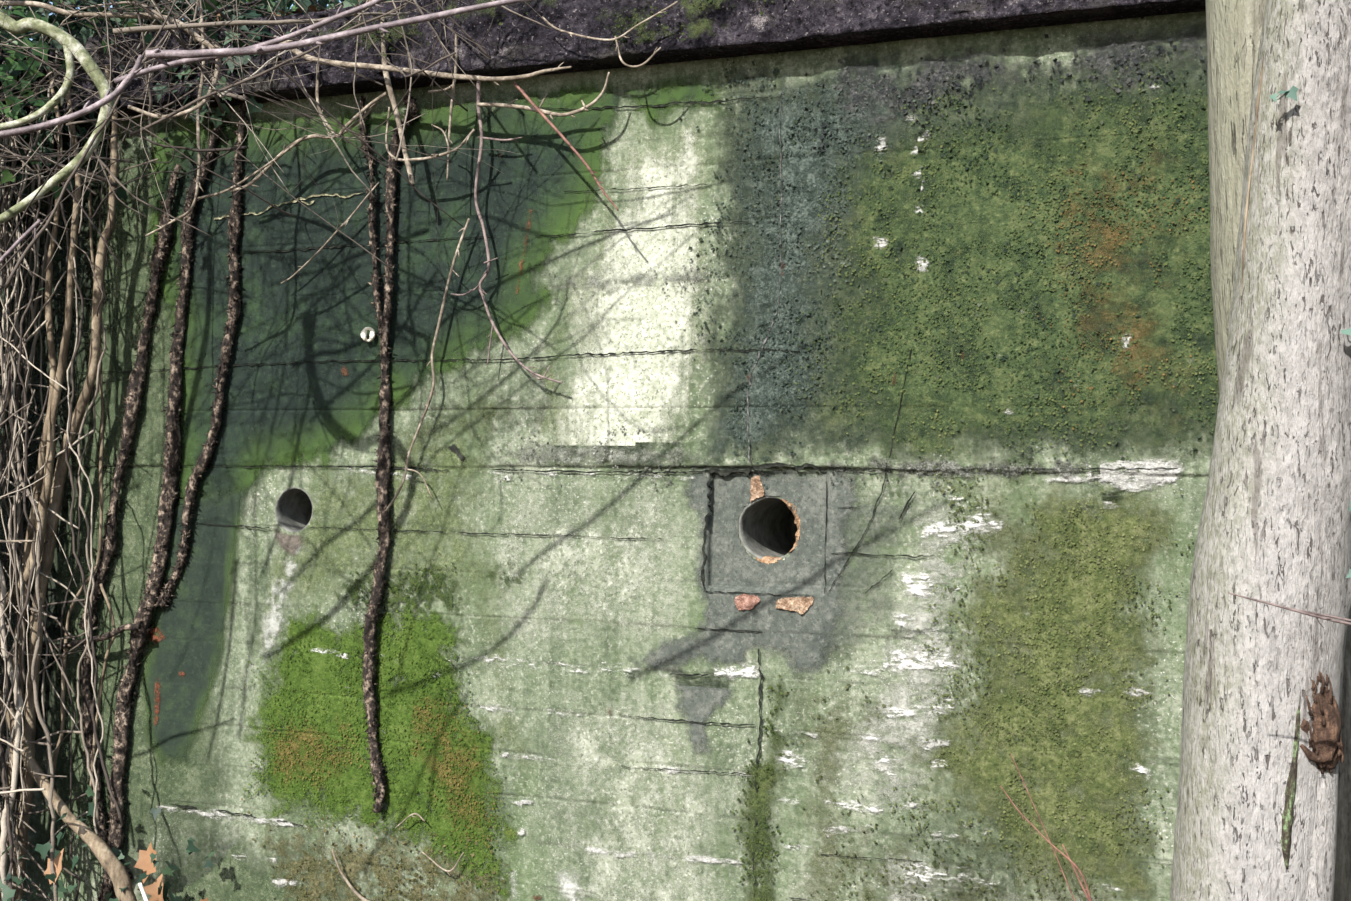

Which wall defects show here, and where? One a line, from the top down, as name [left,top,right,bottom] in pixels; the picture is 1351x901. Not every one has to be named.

crack [65,89,1176,596]
leakage [556,129,708,446]
leakage [144,488,246,762]
leakage [537,505,665,623]
spalling [735,594,760,610]
leakage [560,467,1002,826]
spalling [775,596,814,614]
leakage [1046,458,1183,504]
crack [172,804,303,826]
leakage [547,709,741,901]
crack [618,628,763,897]
crack [821,854,924,862]